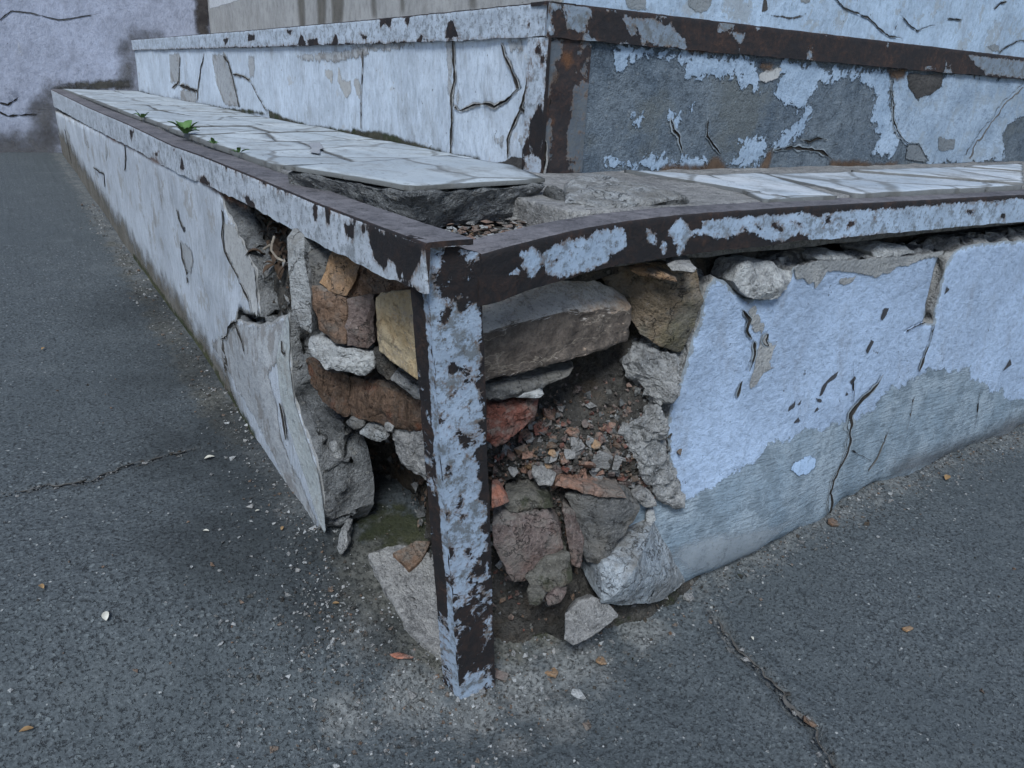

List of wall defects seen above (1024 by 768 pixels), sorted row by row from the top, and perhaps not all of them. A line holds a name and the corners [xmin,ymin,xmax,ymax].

peeling [688,0,712,13]
crack [449,41,551,160]
peeling [603,151,709,171]
crack [773,137,833,160]
peeling [611,44,1024,169]
corrosion [888,68,907,80]
crack [220,205,252,352]
peeling [794,251,944,288]
spalling [748,302,776,389]
crack [279,403,287,440]
crack [826,322,935,516]
peeling [629,365,1024,582]